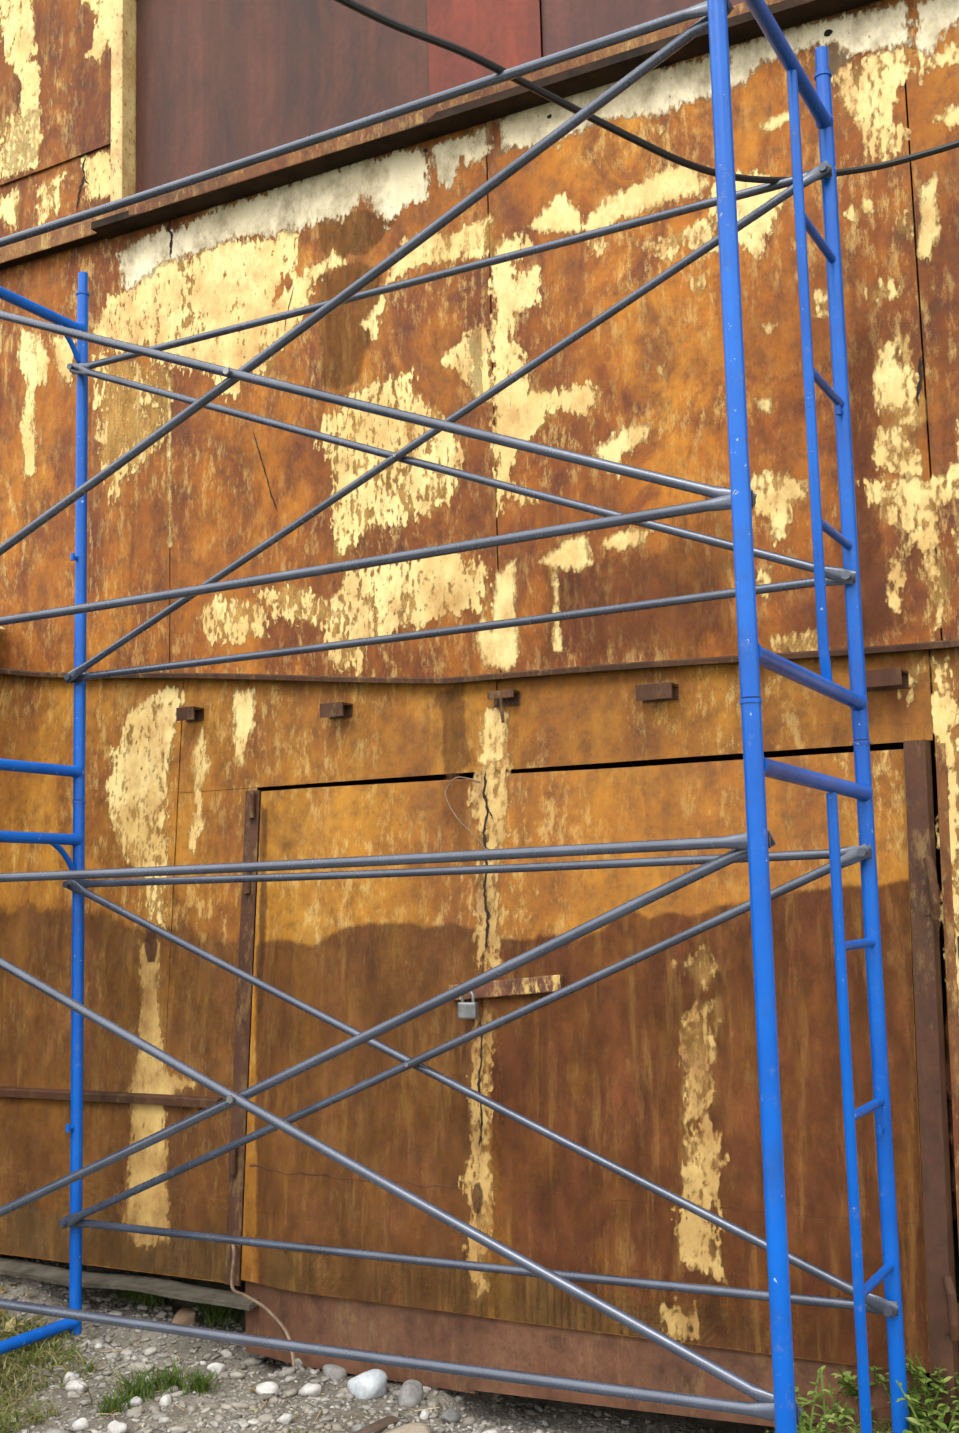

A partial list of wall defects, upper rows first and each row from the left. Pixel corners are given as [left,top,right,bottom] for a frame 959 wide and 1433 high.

peeling [0,0,111,231]
peeling [729,0,959,164]
corrosion [318,211,387,388]
peeling [92,54,719,548]
peeling [735,169,790,261]
peeling [196,366,520,676]
peeling [857,333,959,631]
peeling [105,685,196,1251]
corrosion [145,931,158,962]
corrosion [258,882,267,1011]
crack [482,771,493,952]
corrosion [471,1183,483,1213]